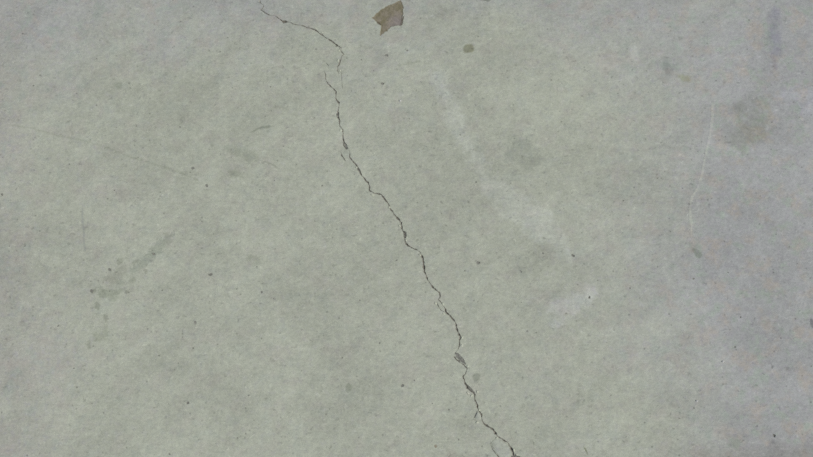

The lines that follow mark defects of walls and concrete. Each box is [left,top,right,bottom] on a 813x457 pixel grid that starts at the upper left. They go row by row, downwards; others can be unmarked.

crack [258,0,520,457]